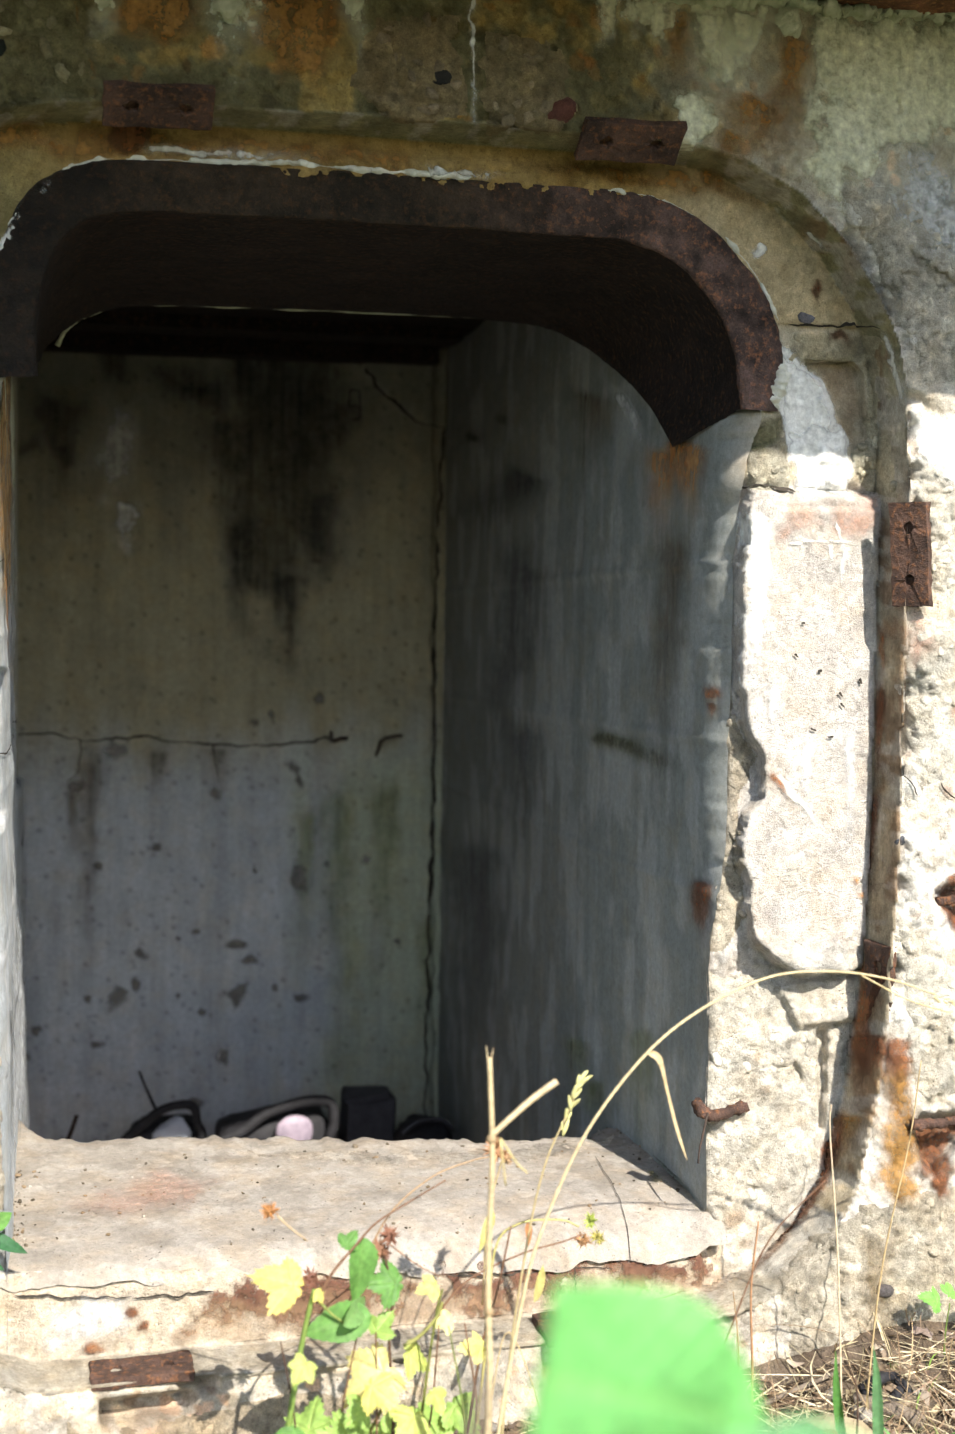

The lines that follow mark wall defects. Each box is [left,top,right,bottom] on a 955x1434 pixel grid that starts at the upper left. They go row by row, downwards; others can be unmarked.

corrosion [253,0,343,73]
corrosion [37,127,408,171]
corrosion [1,377,12,624]
crack [0,720,349,783]
corrosion [875,688,884,764]
spalling [709,691,758,952]
corrosion [856,799,877,896]
spalling [894,912,955,1101]
spalling [705,971,821,1233]
corrosion [851,963,919,1201]
corrosion [442,1260,587,1318]
corrosion [604,1253,713,1287]